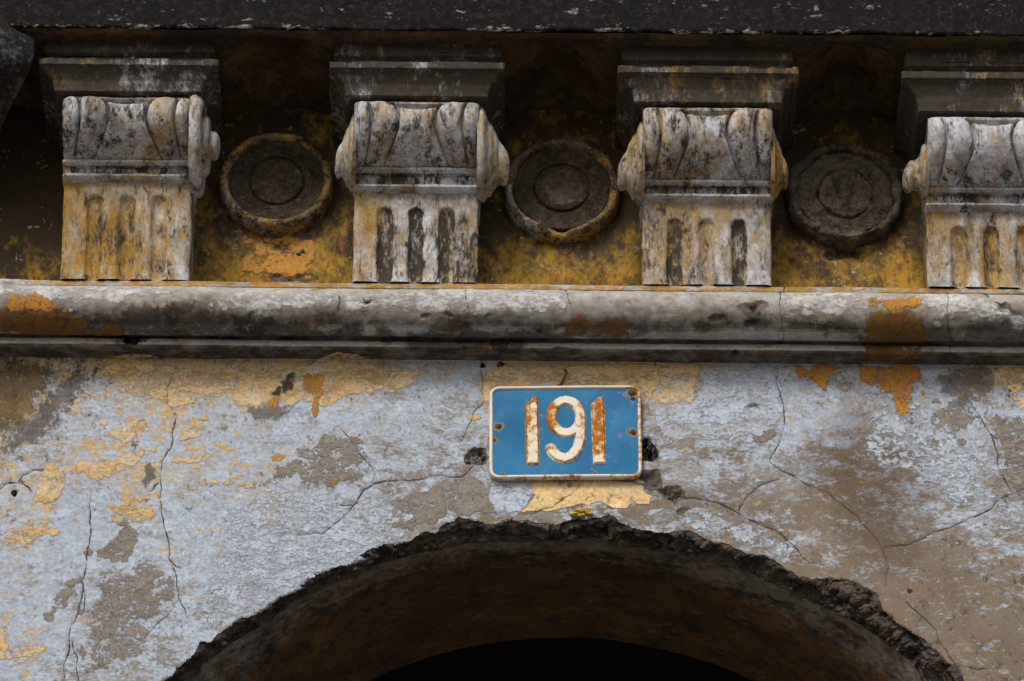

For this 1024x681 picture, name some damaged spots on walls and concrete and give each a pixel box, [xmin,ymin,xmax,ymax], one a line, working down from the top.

damp [55,301,363,344]
peeling [209,234,572,318]
damp [378,315,563,357]
peeling [91,338,428,441]
crack [0,469,42,492]
peeling [0,517,60,550]
peeling [34,418,157,503]
crack [143,366,188,639]
crack [279,372,484,537]
flaking render [163,362,964,681]
crack [654,371,1023,573]
crack [63,497,92,681]